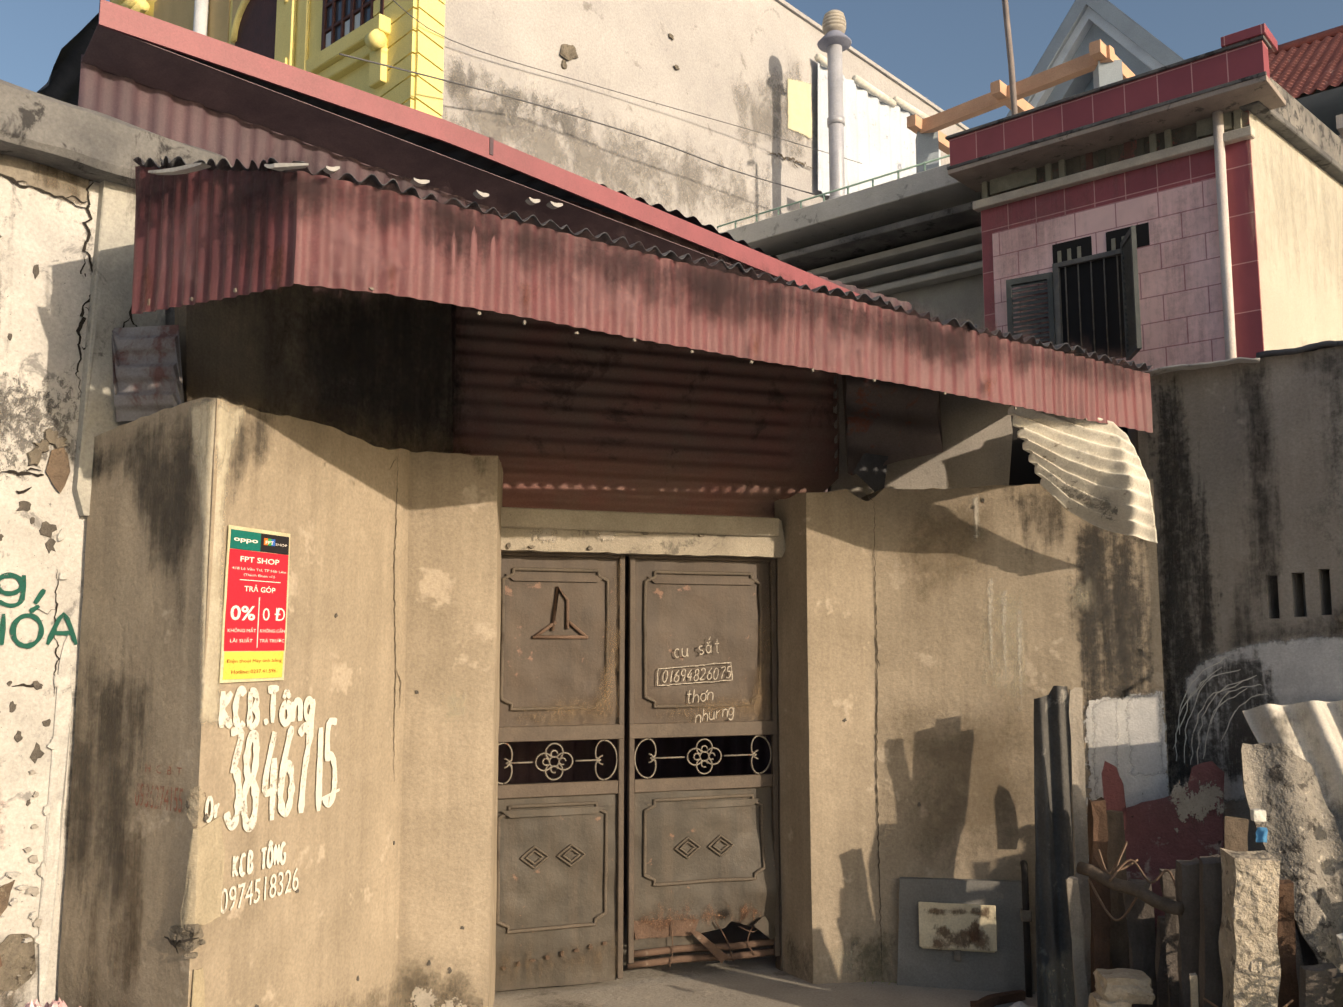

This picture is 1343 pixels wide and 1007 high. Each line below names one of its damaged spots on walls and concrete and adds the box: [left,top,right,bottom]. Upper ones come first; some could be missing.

water stain [0,372,81,479]
crack [0,173,94,393]
crack [123,306,137,328]
water stain [143,400,244,723]
water stain [1043,378,1221,791]
peeling [0,634,72,1007]
water stain [65,667,143,979]